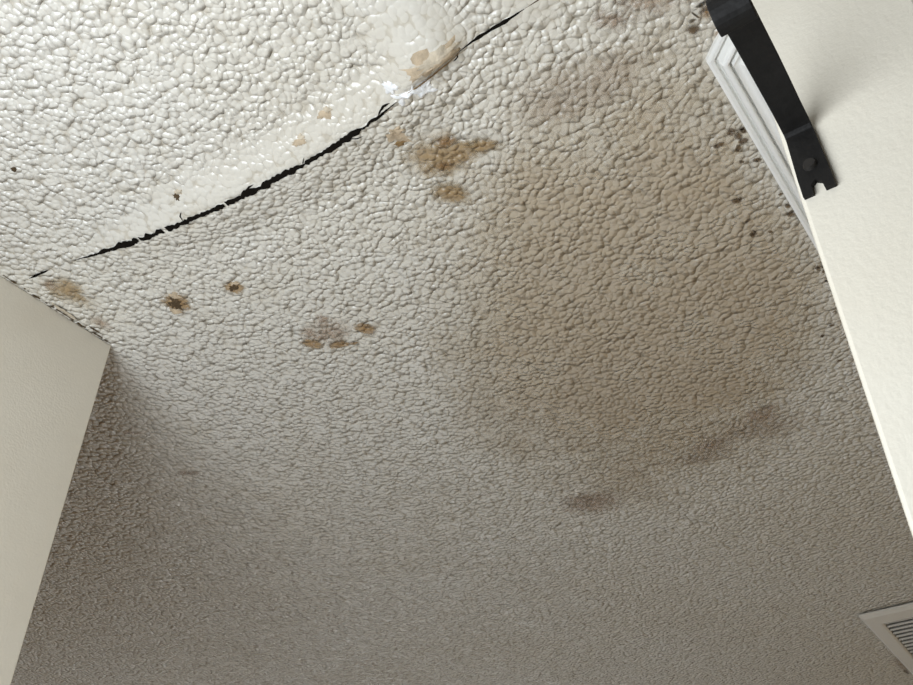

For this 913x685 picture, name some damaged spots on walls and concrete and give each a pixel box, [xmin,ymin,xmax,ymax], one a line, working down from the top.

crack [453,0,539,62]
water stain [415,137,498,175]
water stain [714,127,762,163]
crack [74,102,396,261]
water stain [434,185,465,202]
water stain [491,148,787,430]
water stain [301,317,375,349]